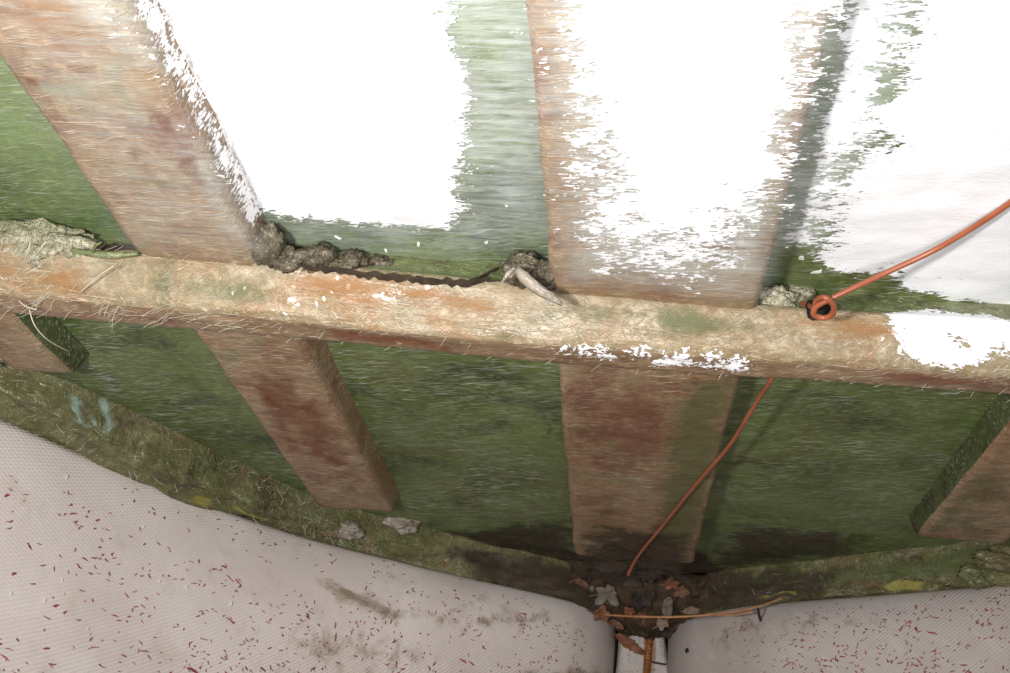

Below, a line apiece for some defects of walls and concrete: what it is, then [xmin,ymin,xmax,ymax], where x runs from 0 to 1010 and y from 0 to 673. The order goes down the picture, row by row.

damp [883,580,924,591]